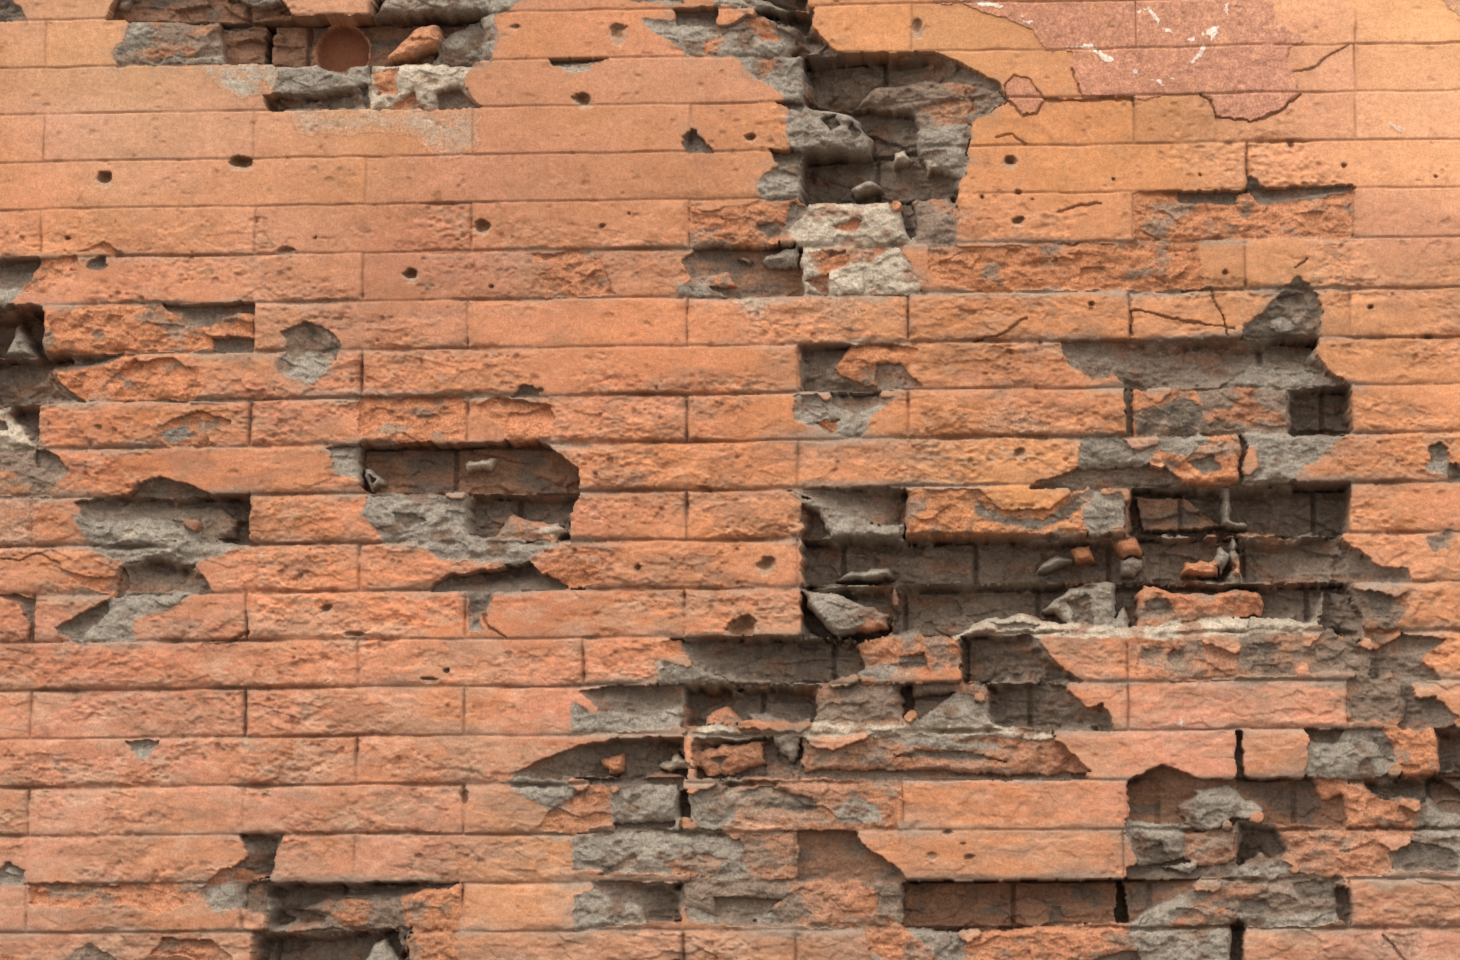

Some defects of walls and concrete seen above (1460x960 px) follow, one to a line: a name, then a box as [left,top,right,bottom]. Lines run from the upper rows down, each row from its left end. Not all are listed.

spalling [111,0,522,112]
spalling [552,0,1356,307]
crack [1200,45,1350,123]
spalling [0,237,255,499]
spalling [1,595,36,644]
spalling [51,478,252,646]
spalling [328,386,606,633]
spalling [501,277,1460,960]
spalling [0,834,463,960]